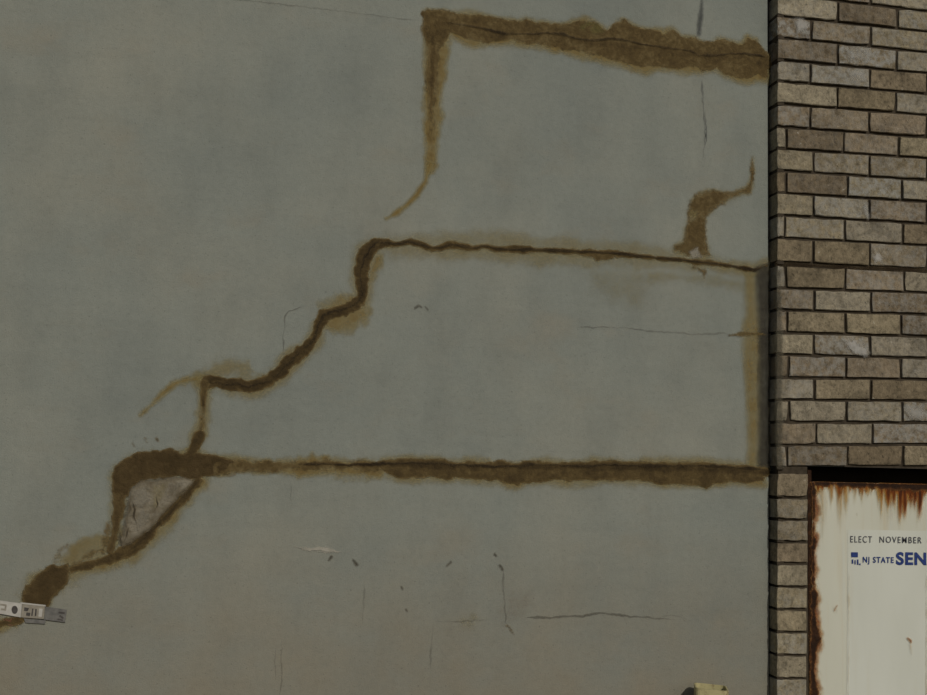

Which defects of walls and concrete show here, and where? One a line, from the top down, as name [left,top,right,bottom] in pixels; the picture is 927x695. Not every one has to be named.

crack [452,5,765,57]
leakage [385,8,772,219]
crack [476,245,927,272]
crack [228,241,453,388]
crack [729,329,763,337]
leakage [22,159,782,607]
crack [311,462,762,470]
spalling [119,477,194,547]
rust [809,482,927,695]
leakage [0,617,32,632]